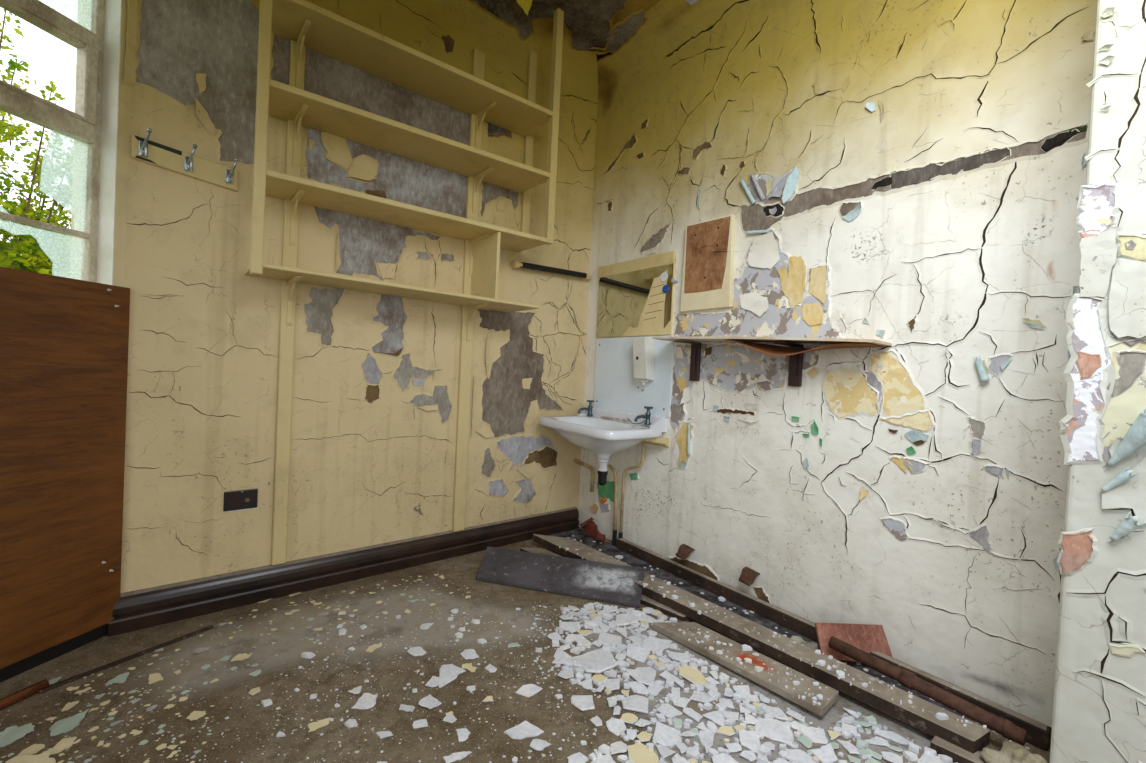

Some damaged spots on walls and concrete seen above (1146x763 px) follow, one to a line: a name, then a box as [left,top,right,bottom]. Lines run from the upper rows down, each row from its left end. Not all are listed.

crack [126,186,214,238]
peeling [134,0,291,168]
crack [129,276,328,418]
crack [127,433,438,490]
peeling [301,206,462,425]
peeling [302,127,520,228]
peeling [471,308,564,521]
crack [529,0,844,406]
crack [700,453,772,518]
peeling [655,121,1090,501]
crack [797,0,1146,763]
peeling [1053,181,1146,611]